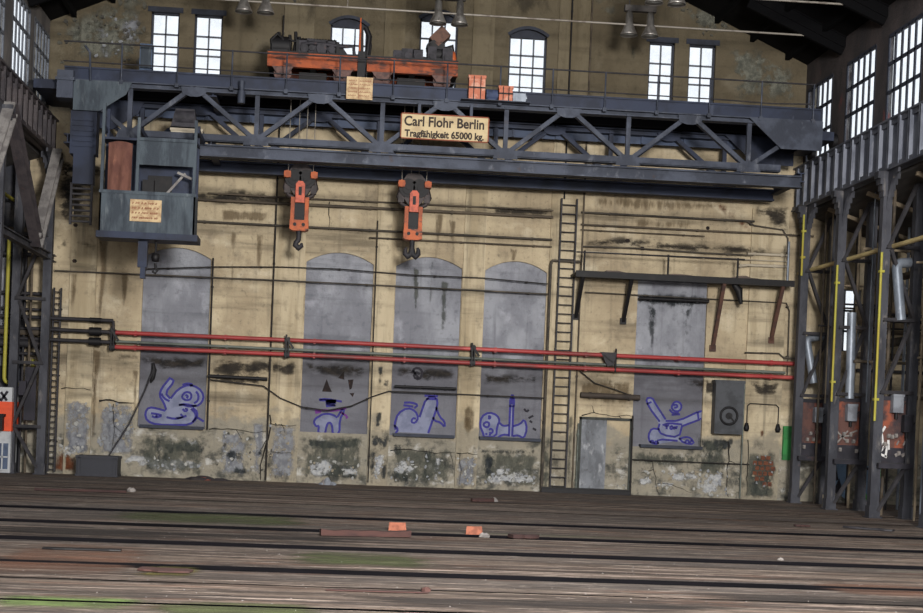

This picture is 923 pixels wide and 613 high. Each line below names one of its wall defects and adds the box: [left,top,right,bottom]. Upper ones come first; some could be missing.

peeling [58,401,204,471]
water stain [144,440,204,470]
peeling [216,423,296,478]
water stain [307,439,360,478]
peeling [374,455,384,479]
water stain [371,413,447,482]
peeling [391,454,443,483]
peeling [457,457,536,486]
water stain [482,451,534,484]
peeling [640,469,728,497]